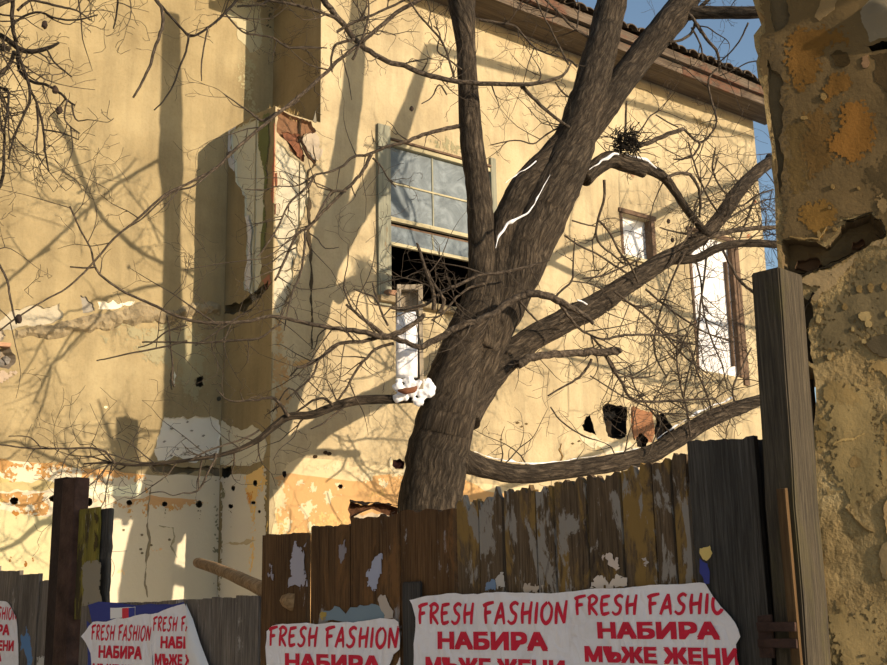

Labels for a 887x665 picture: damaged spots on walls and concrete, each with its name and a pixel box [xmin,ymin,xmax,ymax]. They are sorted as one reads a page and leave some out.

peeling [767,61,784,194]
peeling [225,104,323,315]
crack [789,212,873,240]
spalling [781,214,887,275]
peeling [0,303,64,369]
peeling [80,295,135,313]
spalling [804,298,821,363]
peeling [151,416,267,478]
spalling [571,403,674,455]
peeling [89,483,142,497]
spalling [348,502,398,521]
peeling [0,510,52,581]